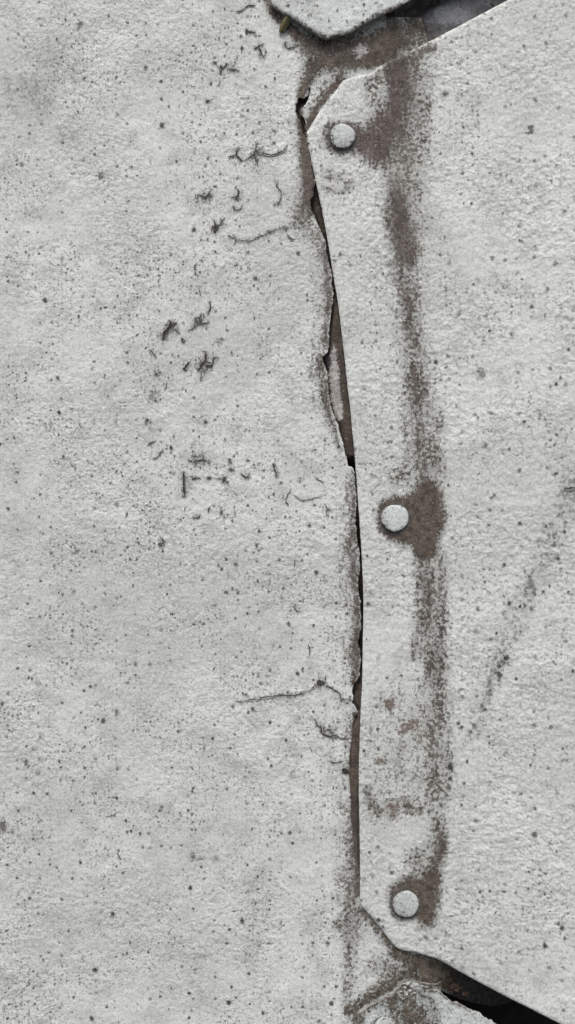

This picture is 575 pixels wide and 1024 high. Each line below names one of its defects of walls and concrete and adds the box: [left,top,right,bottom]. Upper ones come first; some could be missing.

crack [195,129,295,245]
crack [179,454,329,520]
rust [323,42,453,929]
crack [236,644,352,703]
crack [314,719,348,764]
crack [354,789,362,873]